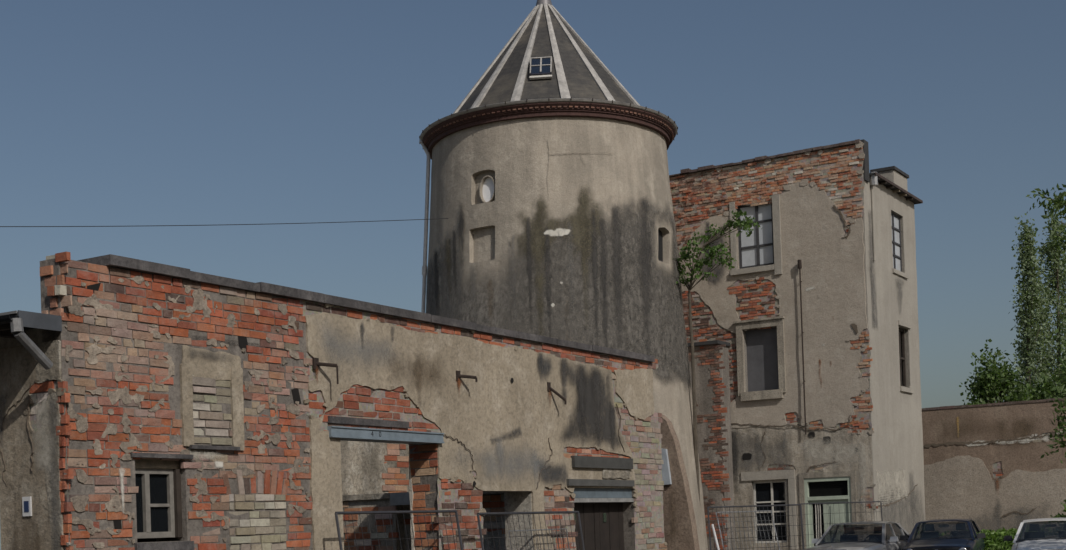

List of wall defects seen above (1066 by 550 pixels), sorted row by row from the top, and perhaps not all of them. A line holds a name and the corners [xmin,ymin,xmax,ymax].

spalling [669,141,865,256]
crack [0,384,44,487]
crack [444,434,474,470]
spalling [291,299,667,550]
water stain [426,190,691,384]
water stain [538,353,620,447]
spalling [682,276,781,403]
spalling [783,329,874,444]